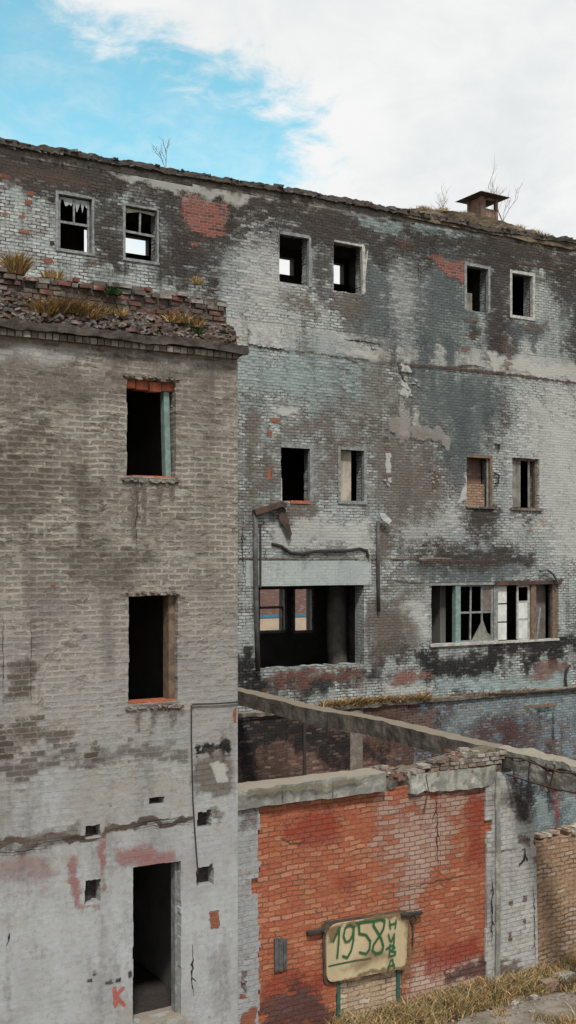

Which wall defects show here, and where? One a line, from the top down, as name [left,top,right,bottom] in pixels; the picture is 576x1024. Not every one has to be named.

spalling [179,192,231,247]
water stain [443,336,458,378]
water stain [491,321,544,358]
peeling [400,363,421,398]
peeling [387,417,451,451]
spalling [400,705,438,729]
water stain [507,781,558,828]
crack [397,791,536,963]
crack [189,945,197,995]